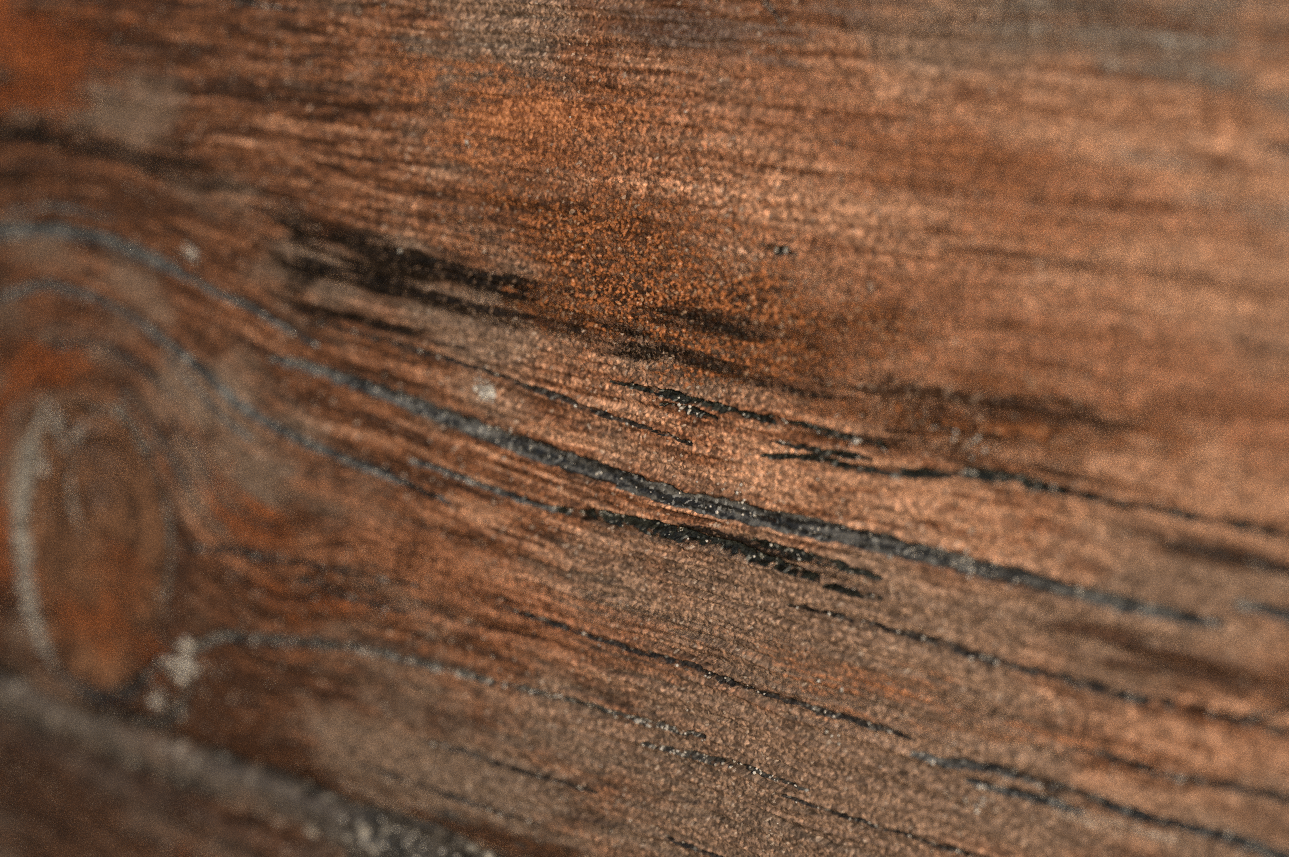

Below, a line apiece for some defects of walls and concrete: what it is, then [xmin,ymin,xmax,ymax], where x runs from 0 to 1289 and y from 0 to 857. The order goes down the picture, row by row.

crack [0,202,1289,737]
crack [177,629,982,857]
crack [497,604,1289,857]